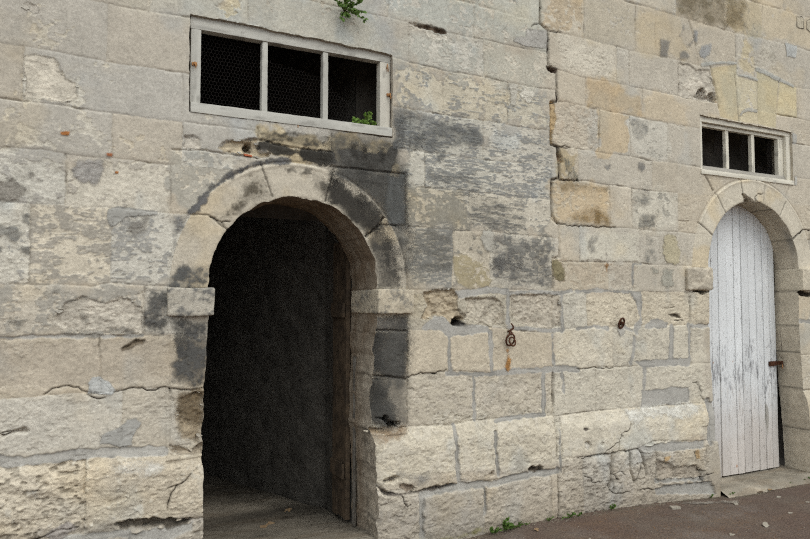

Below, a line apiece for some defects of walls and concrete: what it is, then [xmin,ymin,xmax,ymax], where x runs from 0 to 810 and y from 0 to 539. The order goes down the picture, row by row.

spalling [678,63,715,103]
spalling [421,288,505,326]
crack [584,430,649,494]